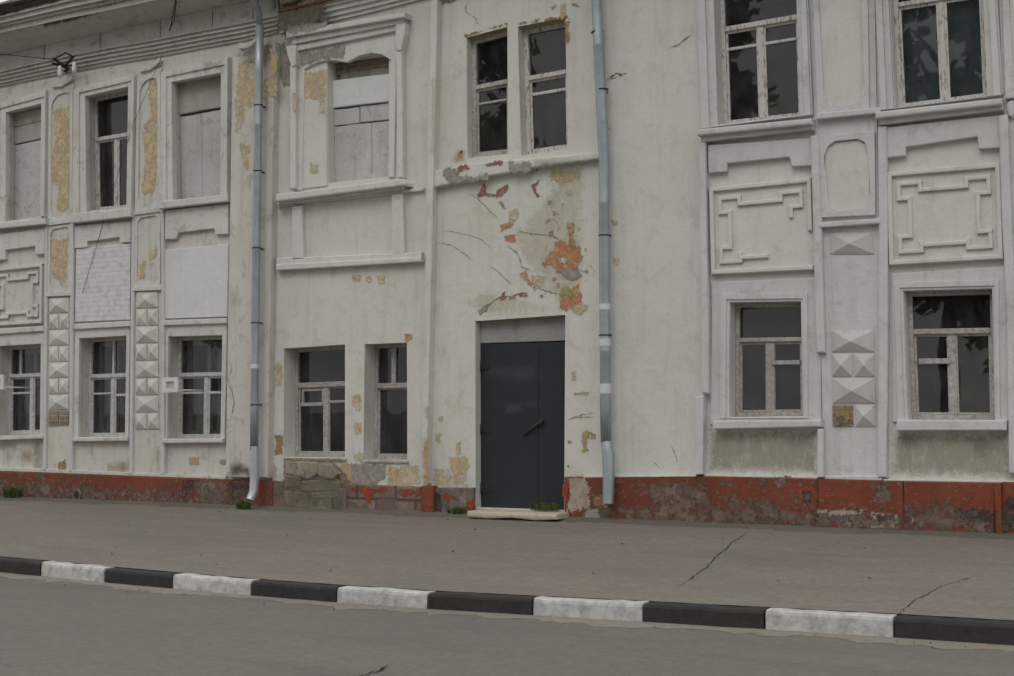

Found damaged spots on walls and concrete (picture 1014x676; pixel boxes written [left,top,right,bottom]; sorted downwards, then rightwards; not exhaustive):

peeling [52,107,70,212]
peeling [141,79,157,195]
peeling [233,42,345,168]
peeling [51,238,69,285]
crack [437,219,559,316]
peeling [442,159,588,316]
peeling [270,435,284,481]
spalling [340,453,421,503]
peeling [432,443,475,512]
peeling [568,430,596,453]
peeling [562,465,1014,534]
crack [682,532,747,584]